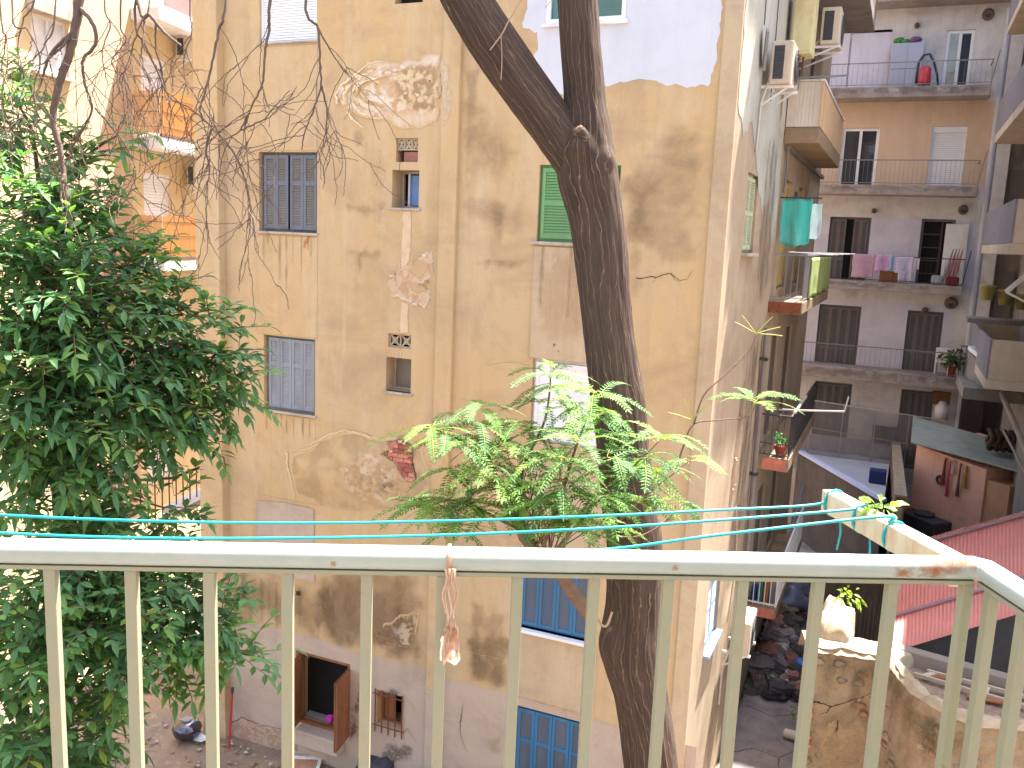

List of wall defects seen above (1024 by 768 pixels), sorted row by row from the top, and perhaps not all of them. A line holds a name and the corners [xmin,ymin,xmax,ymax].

peeling [334,53,450,130]
spalling [388,250,434,308]
crack [637,270,693,285]
flaking render [384,440,415,482]
rust [924,555,969,577]
spalling [372,612,420,652]
crack [745,693,870,737]